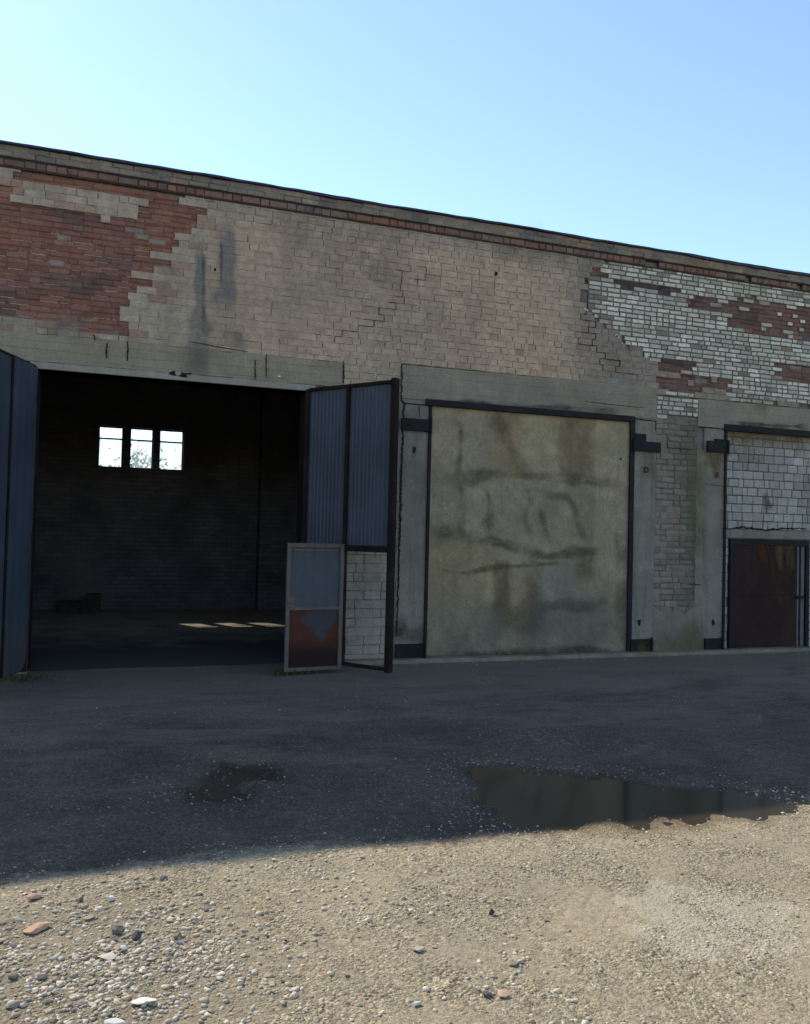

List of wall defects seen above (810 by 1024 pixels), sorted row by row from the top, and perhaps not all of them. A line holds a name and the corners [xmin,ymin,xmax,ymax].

spalling [0,171,207,340]
crack [578,298,638,376]
peeling [584,262,810,418]